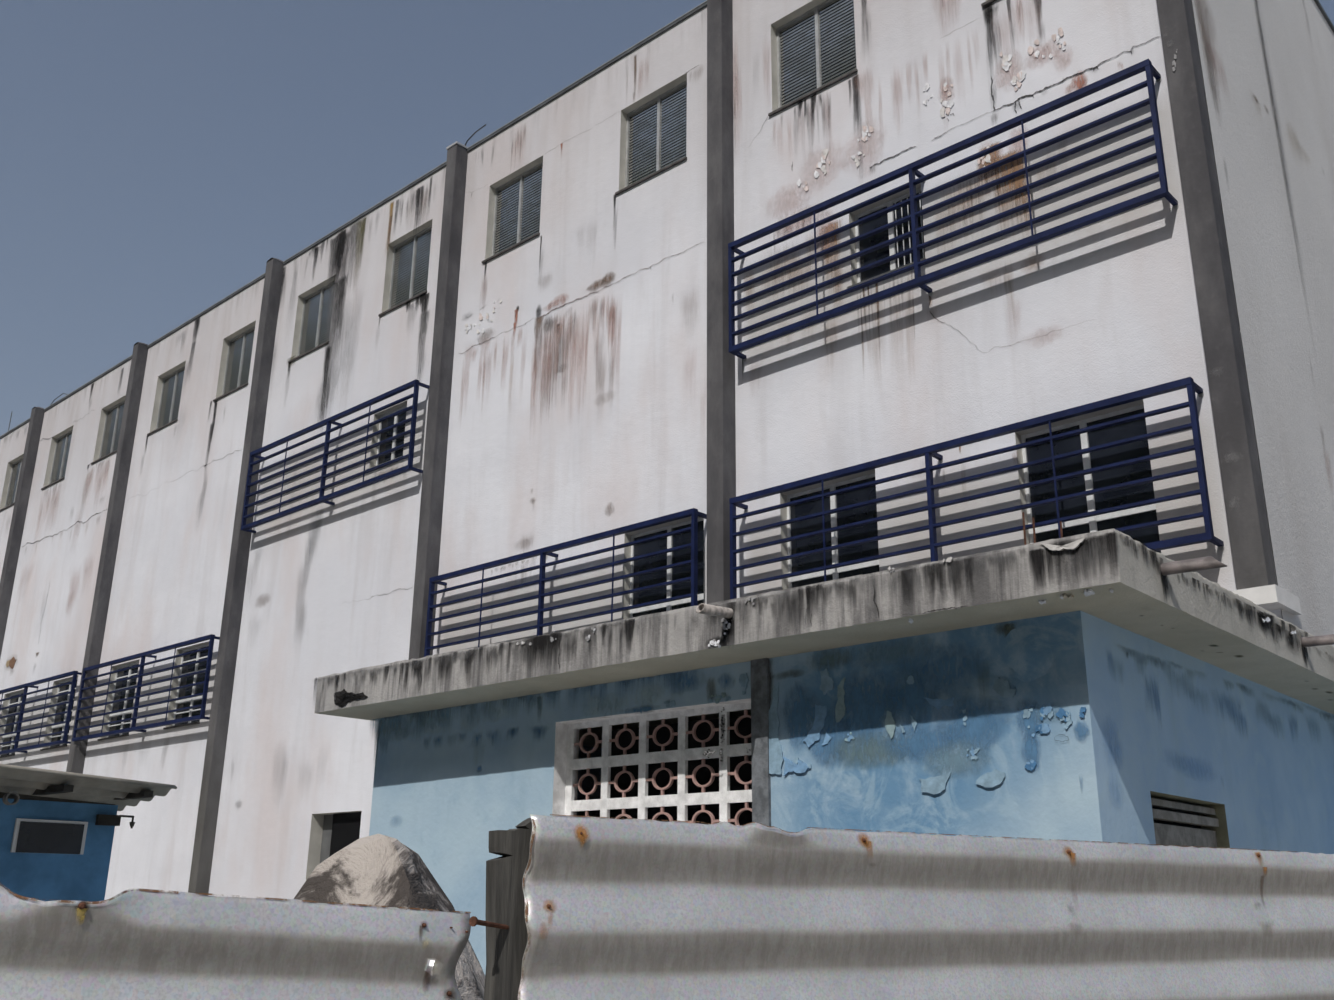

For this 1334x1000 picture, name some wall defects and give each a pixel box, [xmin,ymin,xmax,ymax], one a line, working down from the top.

peeling [999,27,1066,91]
crack [870,37,1157,168]
rust [977,143,1025,206]
water stain [313,218,366,397]
water stain [384,633,560,684]
water stain [625,619,635,641]
water stain [708,602,735,648]
water stain [798,585,819,616]
water stain [901,558,972,593]
water stain [1031,532,1308,664]
peeling [769,644,1088,795]